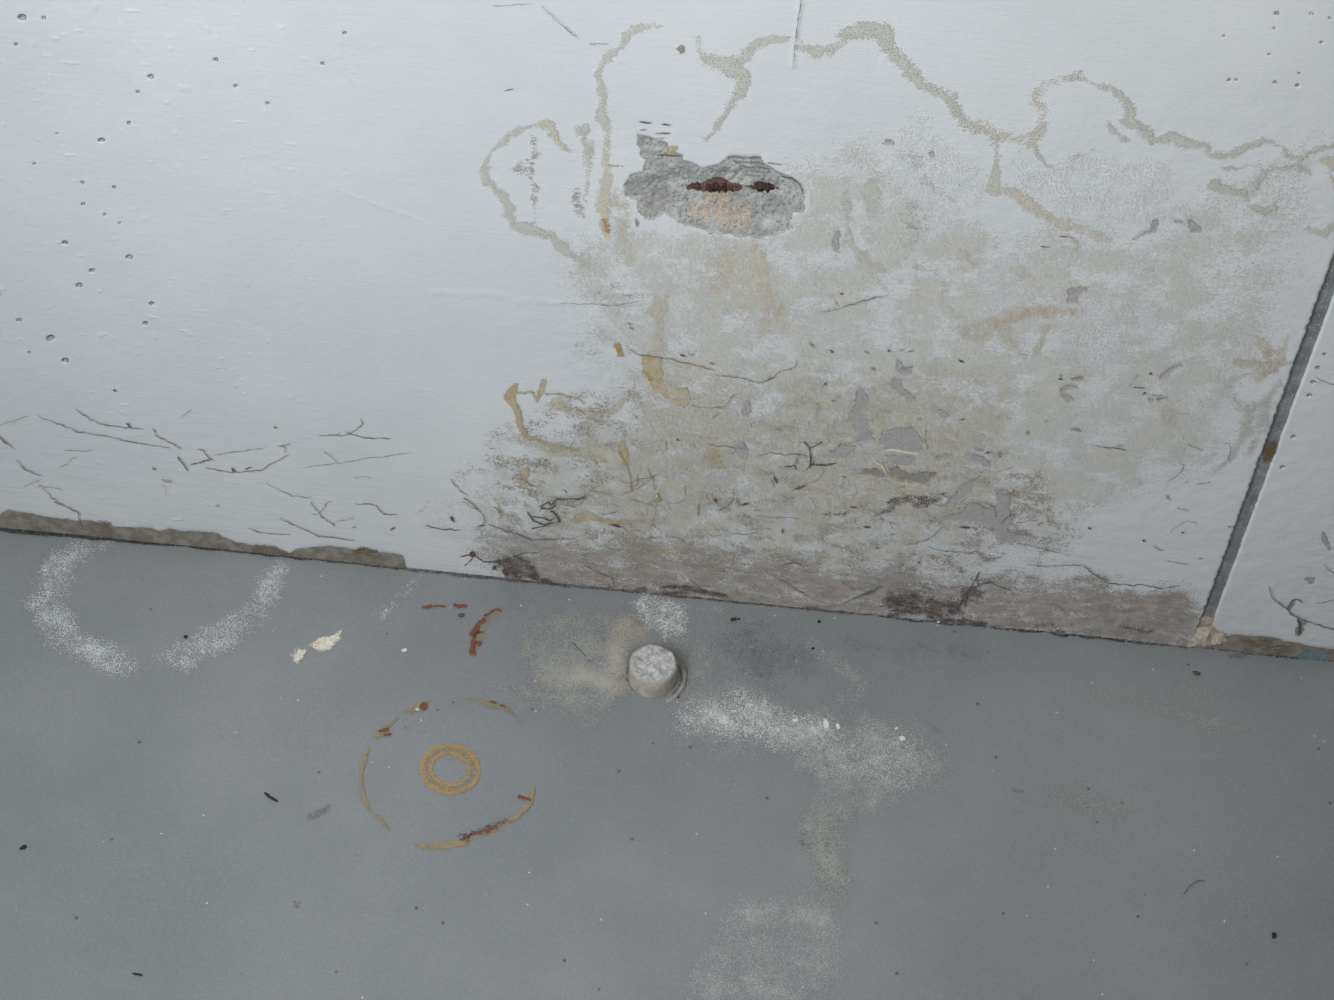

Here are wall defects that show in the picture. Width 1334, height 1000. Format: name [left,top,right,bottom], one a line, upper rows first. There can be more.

spalling [623,121,805,240]
peeling [0,510,406,568]
crack [0,409,686,588]
damp [419,21,1334,1000]
crack [625,345,1231,613]
rust [469,606,501,657]
crack [1269,565,1334,637]
rust [359,700,429,829]
rust [419,743,481,796]
rust [414,786,536,851]